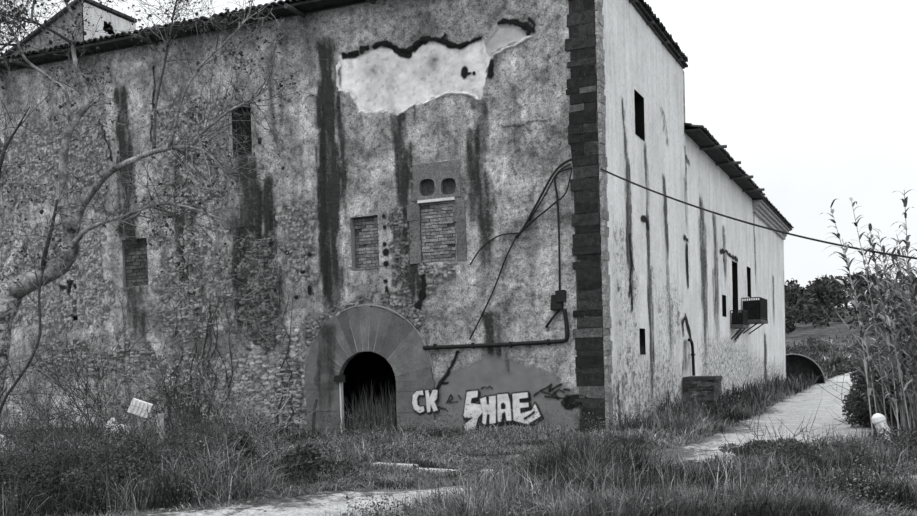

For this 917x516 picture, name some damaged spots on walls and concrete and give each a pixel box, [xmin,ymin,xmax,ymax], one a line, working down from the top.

flaking render [336,25,532,115]
damp [114,87,136,247]
flaking render [0,87,456,434]
damp [315,40,347,308]
damp [390,105,420,302]
damp [467,101,494,266]
damp [622,98,633,289]
damp [646,199,655,388]
damp [699,199,727,353]